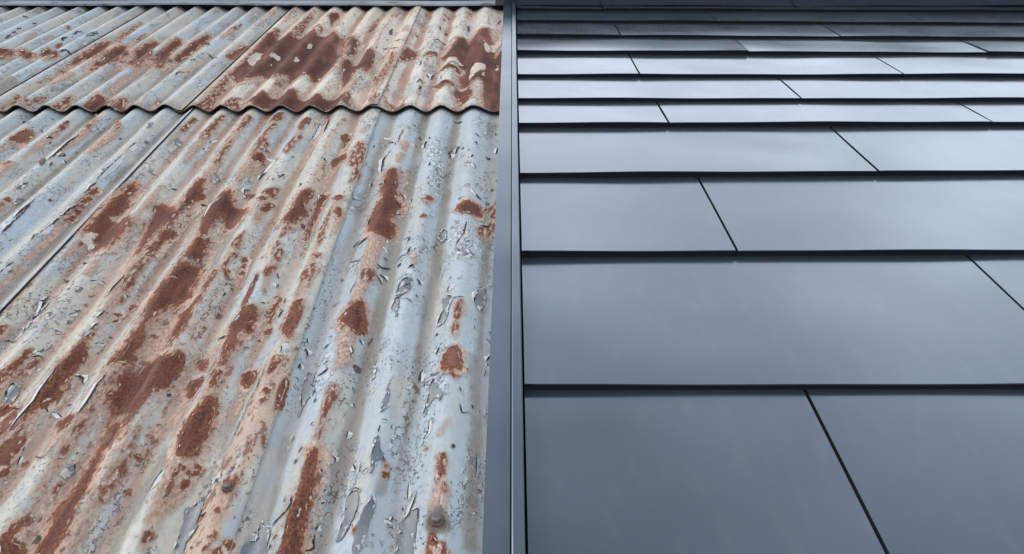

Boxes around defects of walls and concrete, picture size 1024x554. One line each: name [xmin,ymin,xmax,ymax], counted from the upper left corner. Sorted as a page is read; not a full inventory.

peeling [2,297,48,342]
peeling [32,279,105,371]
corrosion [0,11,502,554]
peeling [391,273,424,319]
peeling [435,283,456,328]
peeling [471,285,487,311]
peeling [3,382,26,409]
peeling [380,375,392,411]
peeling [422,379,443,416]
peeling [369,434,392,479]
peeling [335,487,377,554]
peeling [395,492,419,554]